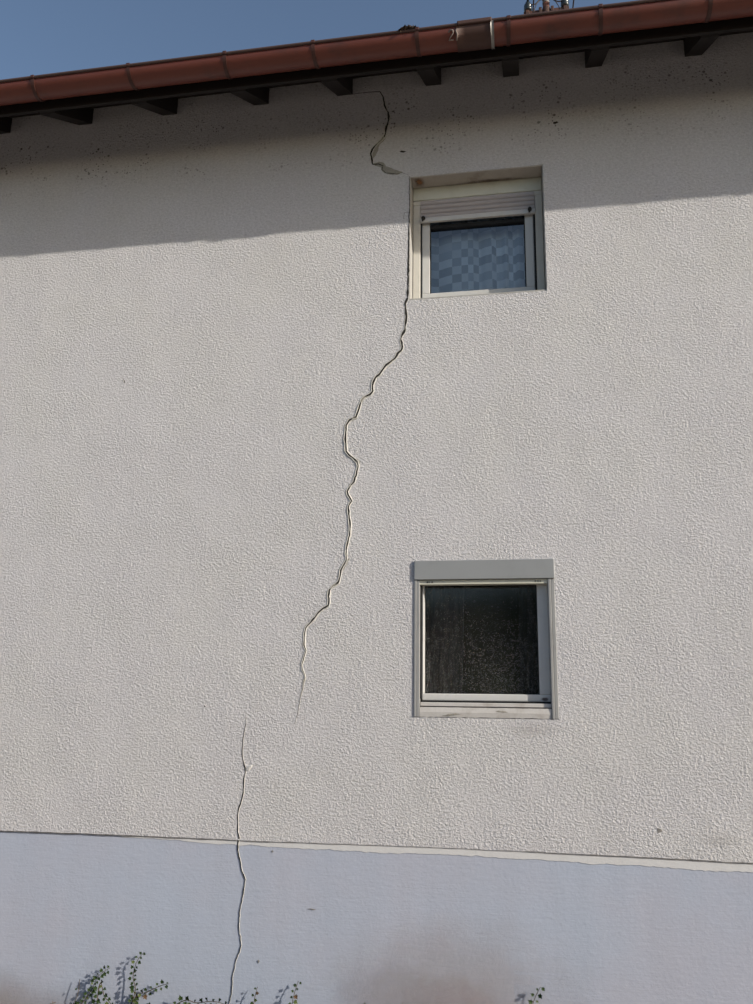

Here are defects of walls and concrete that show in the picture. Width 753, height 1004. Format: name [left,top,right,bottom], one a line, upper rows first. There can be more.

crack [295,91,410,723]
crack [2,724,270,1004]